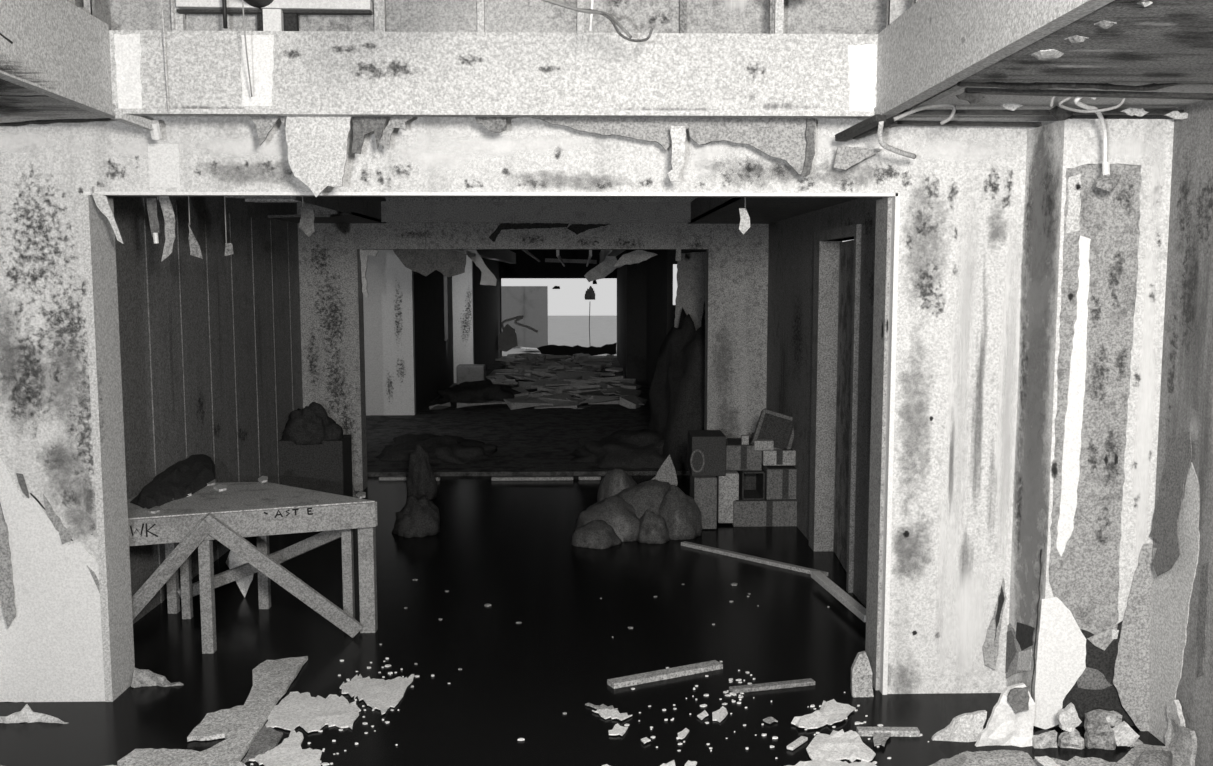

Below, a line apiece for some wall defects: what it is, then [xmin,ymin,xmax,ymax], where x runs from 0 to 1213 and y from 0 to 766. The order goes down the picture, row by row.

leakage [0,67,57,116]
leakage [0,170,103,535]
peeling [1056,174,1091,557]
peeling [0,458,105,724]
peeling [982,432,1210,766]